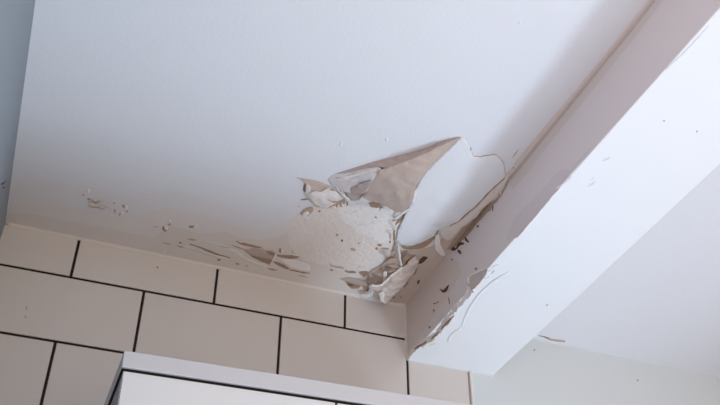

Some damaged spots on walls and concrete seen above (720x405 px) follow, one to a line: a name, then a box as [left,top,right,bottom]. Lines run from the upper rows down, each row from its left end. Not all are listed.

flaking render [227,137,514,304]